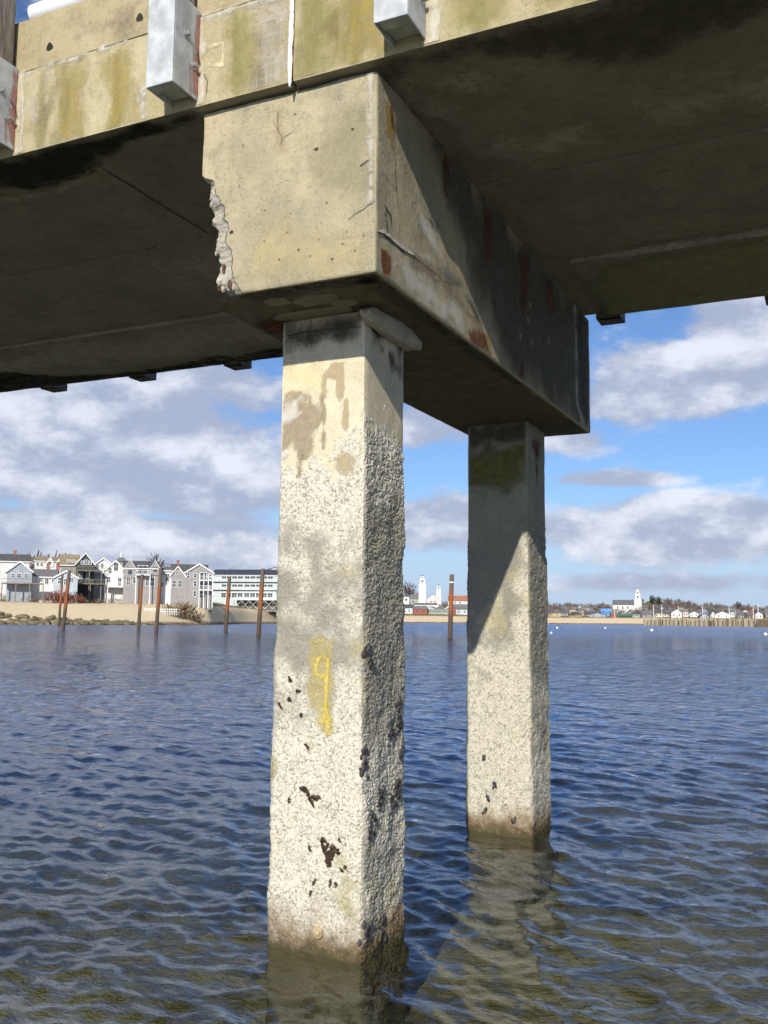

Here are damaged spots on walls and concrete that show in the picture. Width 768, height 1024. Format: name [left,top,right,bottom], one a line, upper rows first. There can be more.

damp [0,71,190,202]
spalling [204,178,243,297]
damp [0,140,696,447]
corrosion [381,248,391,277]
crack [348,159,448,283]
peeling [284,357,348,449]
peeling [337,455,351,473]